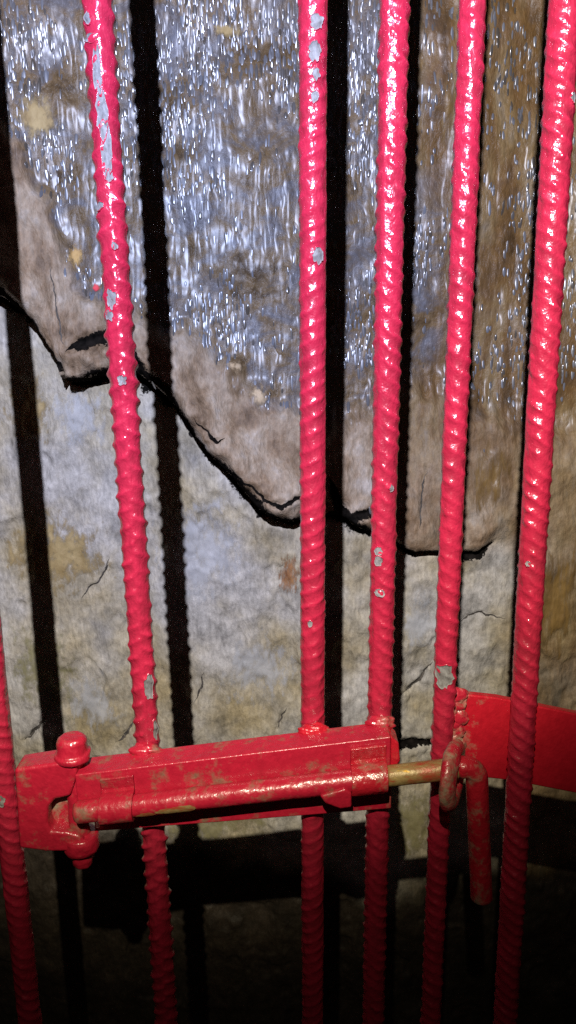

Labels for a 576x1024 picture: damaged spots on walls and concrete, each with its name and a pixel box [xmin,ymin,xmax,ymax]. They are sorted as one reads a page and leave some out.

water stain [0,0,87,221]
water stain [115,0,299,246]
water stain [326,0,380,206]
water stain [407,0,458,166]
water stain [134,263,299,369]
water stain [325,258,376,379]
water stain [401,177,451,334]
water stain [468,0,543,422]
water stain [559,256,576,402]
water stain [4,379,46,448]
crack [82,557,110,597]
crack [460,611,505,622]